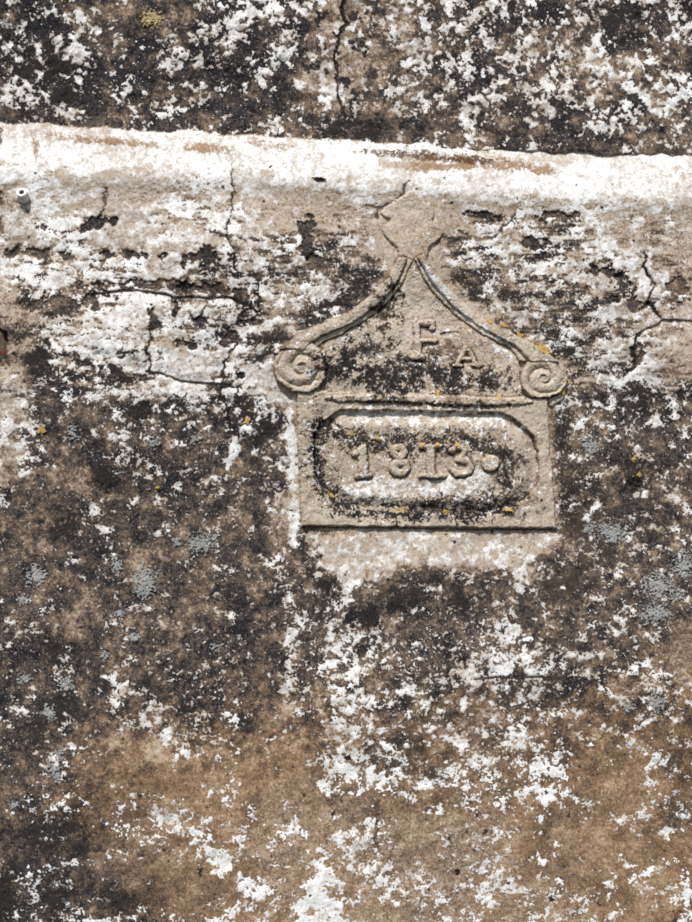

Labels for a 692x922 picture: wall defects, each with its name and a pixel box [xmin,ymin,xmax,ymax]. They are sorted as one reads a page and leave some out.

crack [333,0,348,114]
crack [93,168,261,323]
crack [623,253,687,377]
water stain [75,357,147,384]
water stain [121,389,203,422]
crack [144,329,234,429]
water stain [225,393,279,446]
water stain [49,506,82,552]
water stain [297,532,343,604]
water stain [347,567,490,628]
water stain [481,667,556,698]
water stain [17,693,76,758]